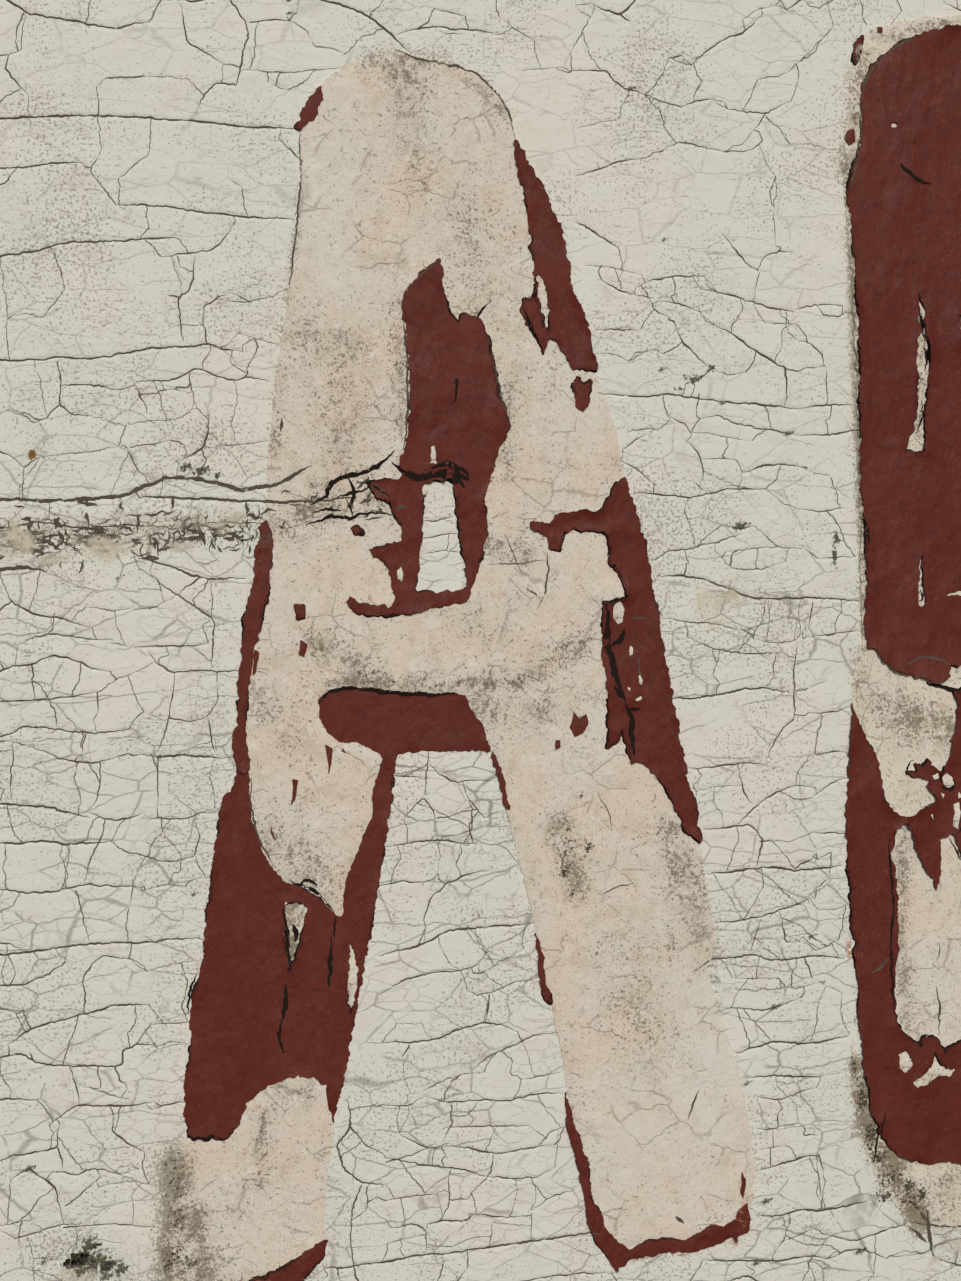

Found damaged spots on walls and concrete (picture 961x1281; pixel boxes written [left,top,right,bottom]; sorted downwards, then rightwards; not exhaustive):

crack [523,278,544,350]
spalling [176,460,224,479]
crack [0,75,470,1281]
peeling [245,52,756,1249]
crack [488,536,550,605]
crack [576,222,864,1053]
peeling [842,15,961,1088]
crack [905,656,959,692]
crack [304,753,617,1281]
crack [870,839,897,1018]
peeling [161,1075,334,1281]
peeling [850,1043,961,1230]